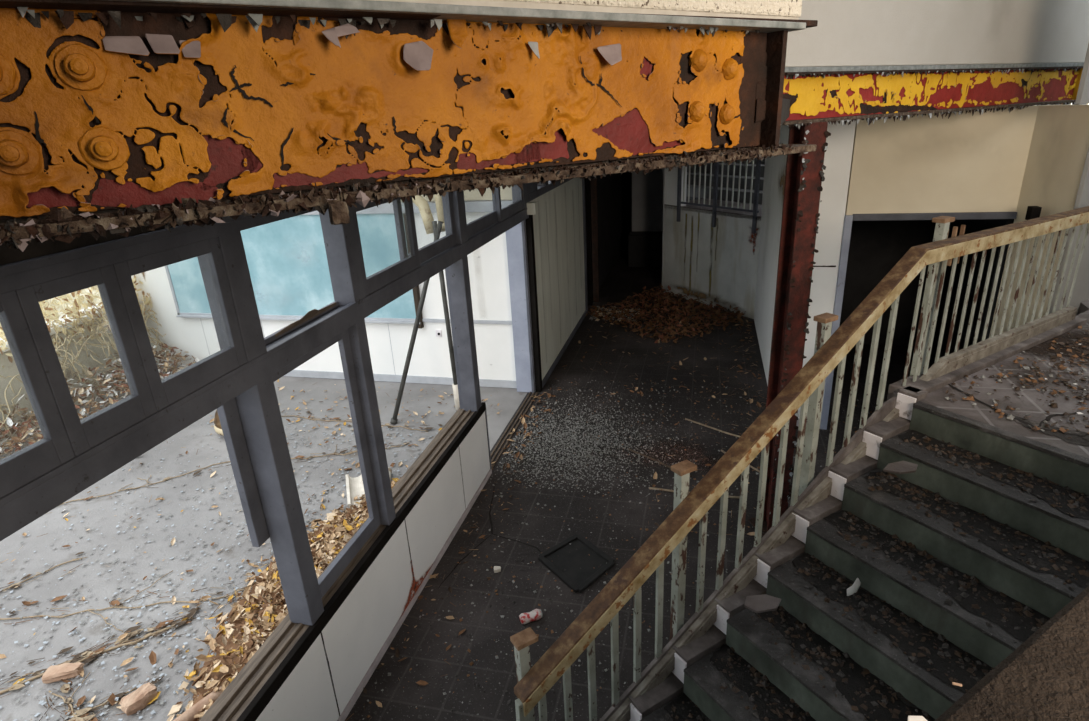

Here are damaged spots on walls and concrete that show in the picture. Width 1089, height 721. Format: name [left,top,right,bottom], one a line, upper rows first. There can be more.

peeling [97,11,227,108]
peeling [271,16,301,45]
peeling [322,17,468,71]
peeling [528,42,540,59]
peeling [597,43,622,66]
peeling [640,56,654,81]
peeling [678,52,697,85]
peeling [709,31,767,148]
peeling [859,77,1068,115]
peeling [592,102,690,155]
peeling [273,124,446,188]
peeling [457,130,569,170]